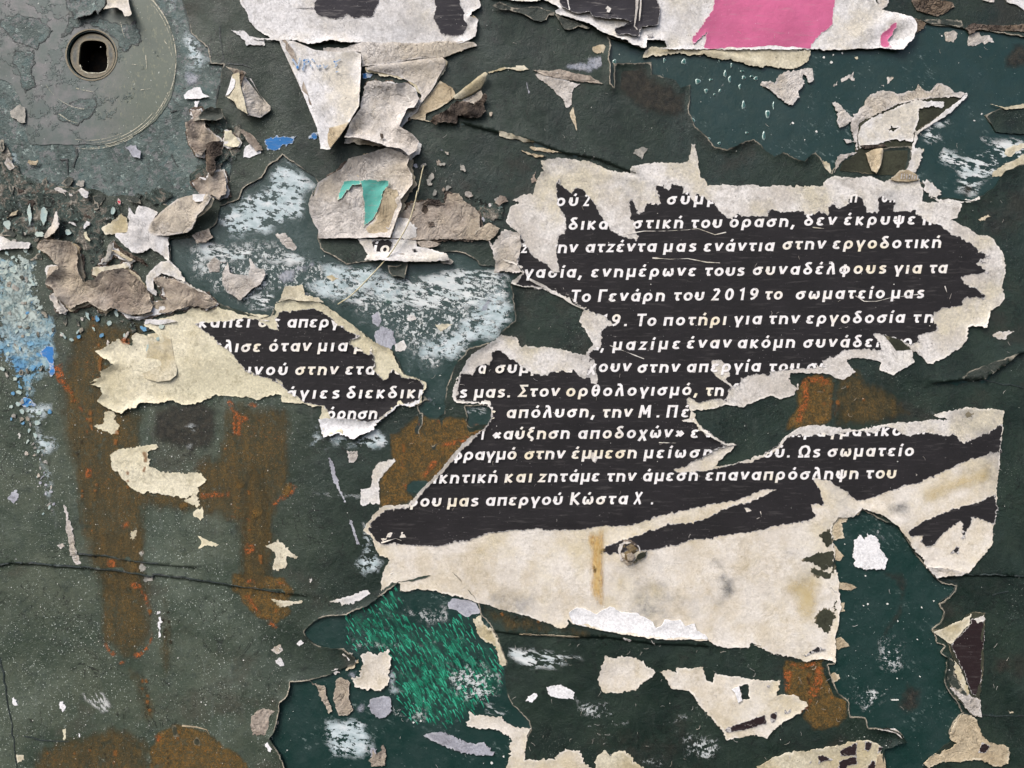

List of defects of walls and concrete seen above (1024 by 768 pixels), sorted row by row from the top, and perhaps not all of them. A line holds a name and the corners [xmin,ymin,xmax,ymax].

peeling [493,2,590,30]
peeling [190,117,245,181]
peeling [568,24,1024,200]
peeling [0,140,174,515]
peeling [170,152,515,440]
rust [787,373,897,429]
rust [54,317,294,664]
rust [380,416,483,507]
crack [0,553,285,594]
peeling [569,606,708,640]
peeling [828,510,968,768]
rust [783,660,846,730]